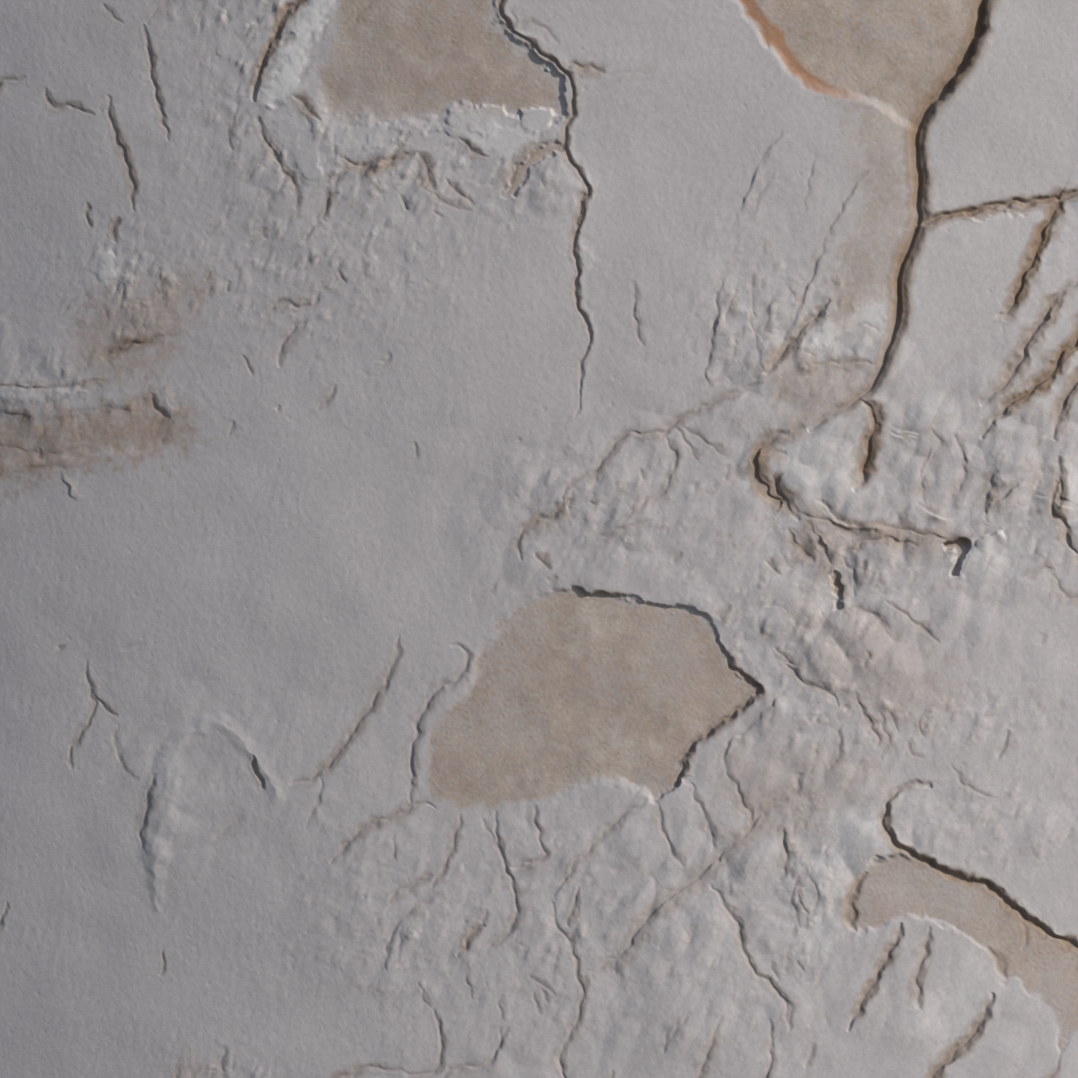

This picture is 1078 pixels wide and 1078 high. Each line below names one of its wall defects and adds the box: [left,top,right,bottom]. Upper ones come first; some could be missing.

damp [0,252,235,504]
crack [226,0,340,223]
crack [262,292,321,369]
crack [338,151,475,207]
spalling [262,0,570,201]
crack [459,0,606,417]
spalling [730,0,814,94]
crack [513,0,1078,604]
spalling [757,0,978,138]
crack [67,659,119,770]
spalling [417,585,767,817]
spalling [849,852,1078,1058]